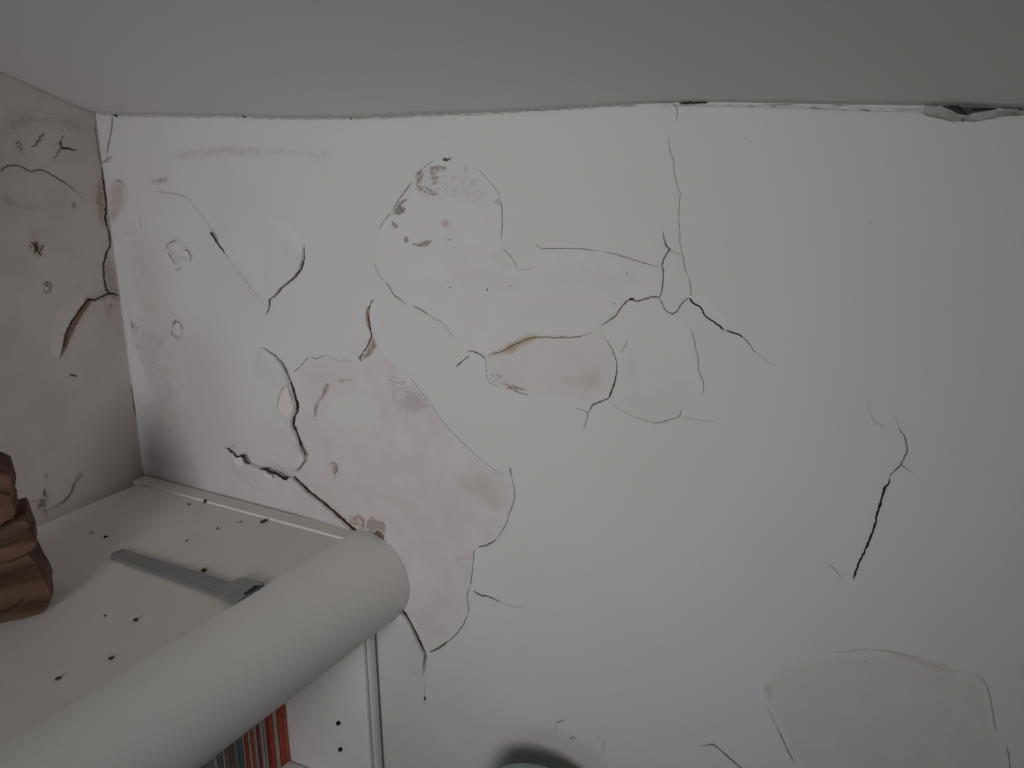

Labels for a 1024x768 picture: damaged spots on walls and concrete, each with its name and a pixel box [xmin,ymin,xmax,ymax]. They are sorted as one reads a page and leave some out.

peeling [920,106,1024,122]
crack [0,115,119,304]
crack [457,148,756,427]
crack [830,429,908,579]